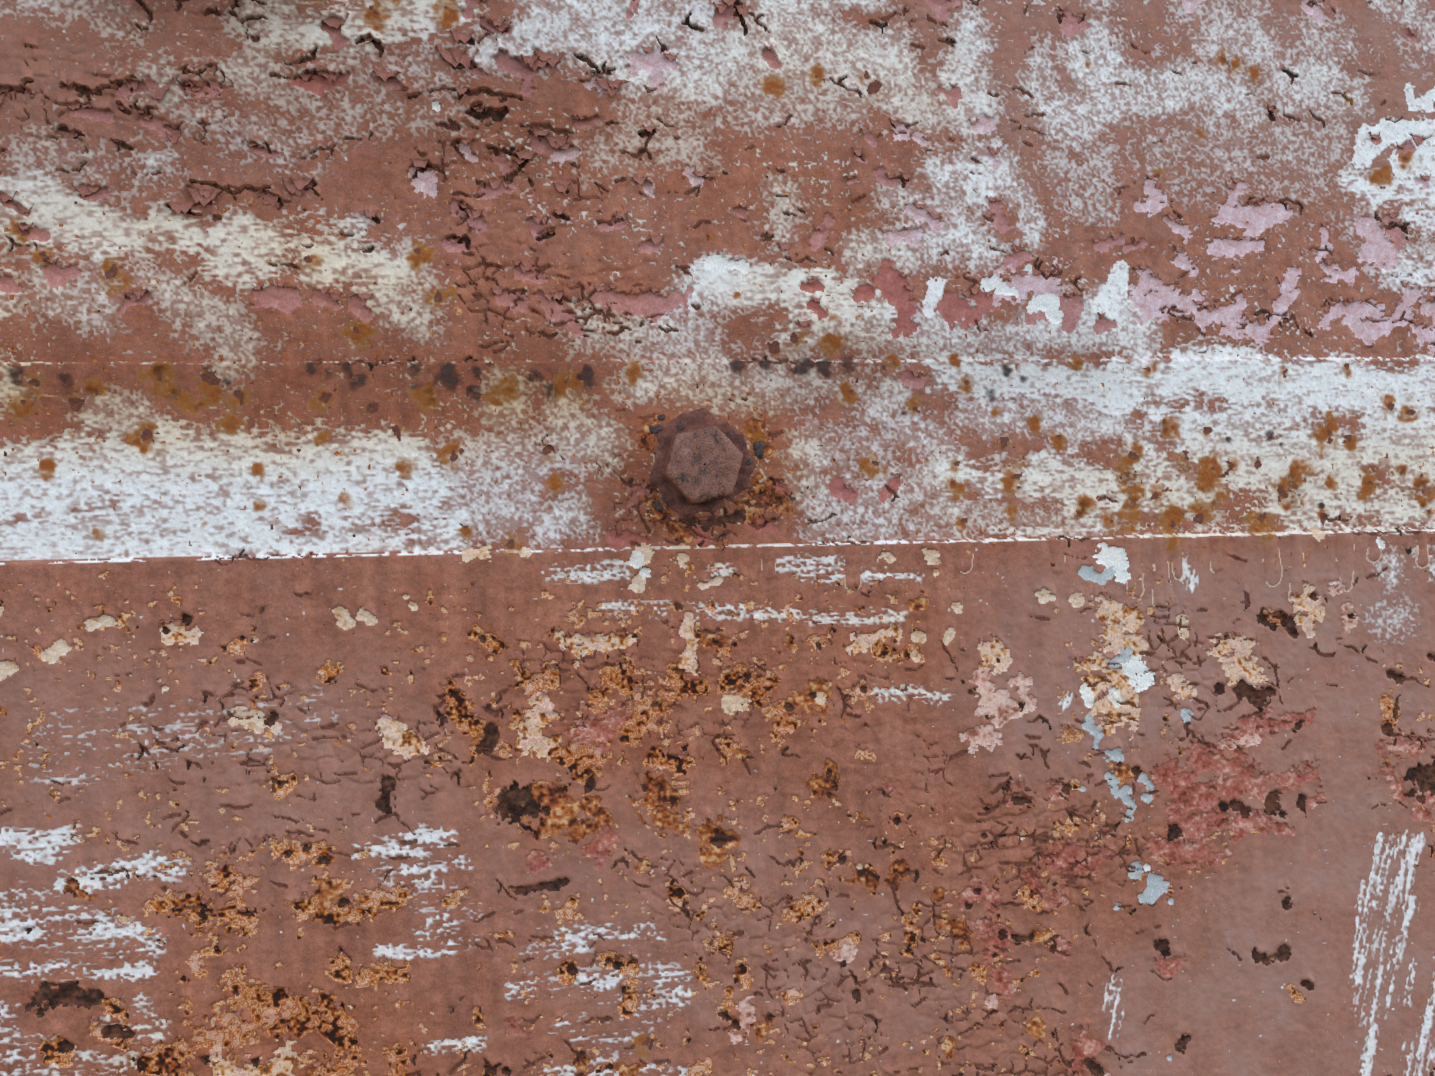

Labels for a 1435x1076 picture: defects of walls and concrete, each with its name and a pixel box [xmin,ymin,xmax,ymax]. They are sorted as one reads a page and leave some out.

peeling [0,0,1435,647]
corrosion [367,325,713,503]
corrosion [1063,398,1435,687]
peeling [910,603,963,663]
corrosion [375,711,430,760]
corrosion [469,595,832,876]
peeling [1079,646,1155,823]
spalling [1213,679,1276,713]
spalling [1228,791,1307,819]
spalling [1403,756,1435,804]
corrosion [150,833,413,939]
corrosion [693,928,803,1044]